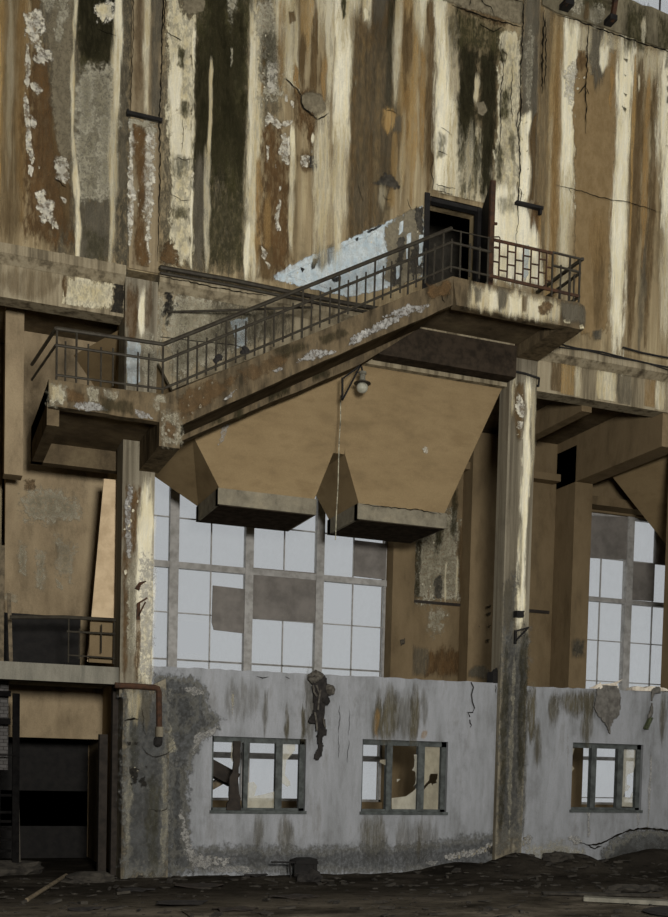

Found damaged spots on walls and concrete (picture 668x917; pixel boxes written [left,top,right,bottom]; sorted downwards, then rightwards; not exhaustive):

water stain [31,0,132,265]
water stain [62,275,124,314]
peeling [23,0,198,268]
crack [286,79,327,119]
water stain [143,0,504,281]
peeling [261,207,424,297]
water stain [349,304,429,346]
rust [527,203,541,258]
crack [453,0,668,243]
rust [122,483,155,682]
water stain [118,380,540,879]
peeling [414,490,463,633]